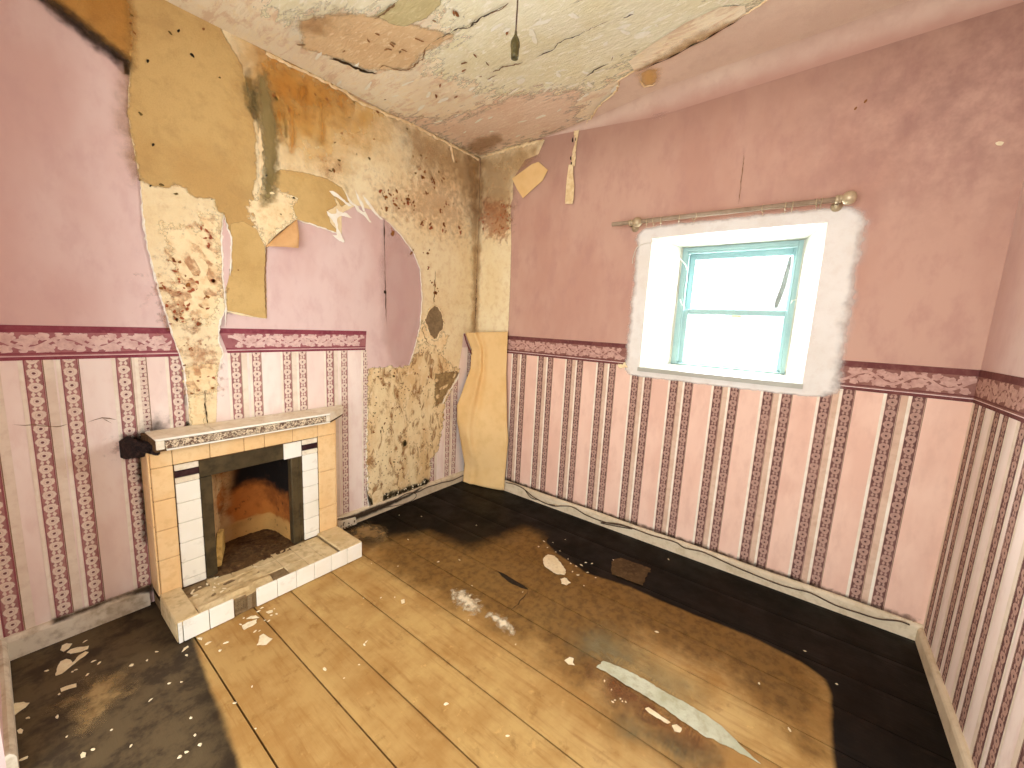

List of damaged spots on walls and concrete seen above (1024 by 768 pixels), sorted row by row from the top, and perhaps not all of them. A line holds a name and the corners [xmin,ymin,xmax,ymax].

crack [332,3,508,74]
crack [487,14,633,80]
damp [246,58,373,204]
peeling [261,0,765,204]
peeling [379,189,415,212]
flaking render [410,249,448,353]